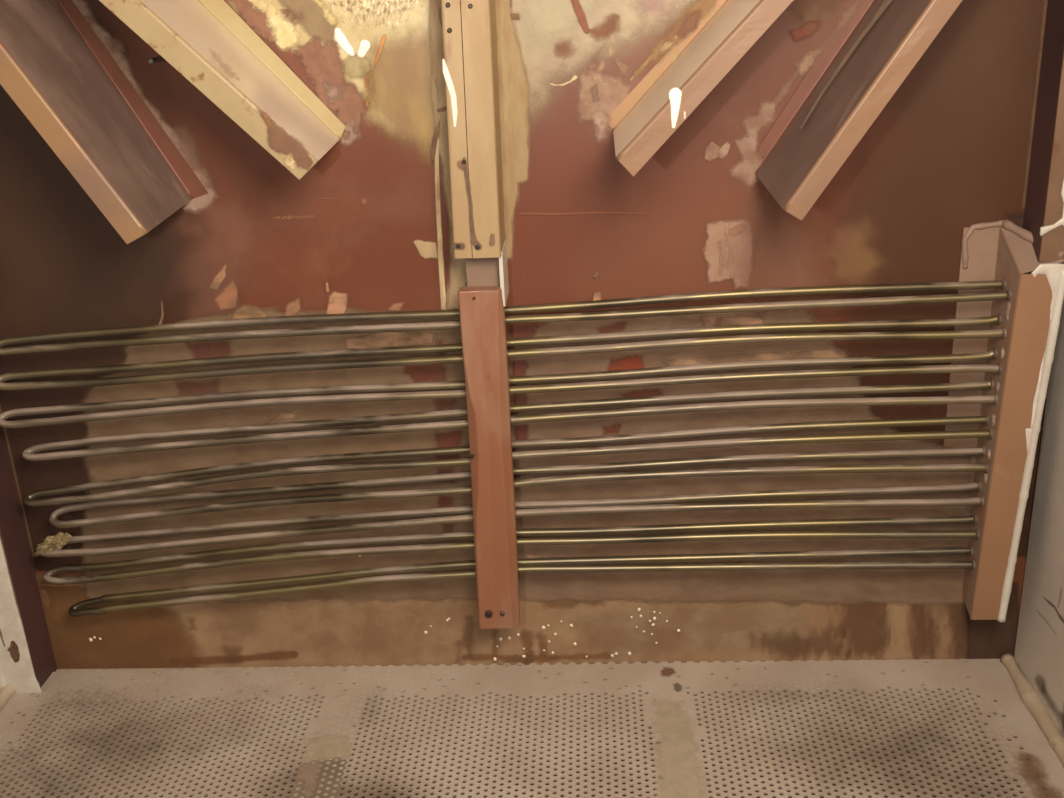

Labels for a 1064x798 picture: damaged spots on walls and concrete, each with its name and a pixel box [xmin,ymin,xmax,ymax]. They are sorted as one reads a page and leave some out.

peeling [233,0,369,145]